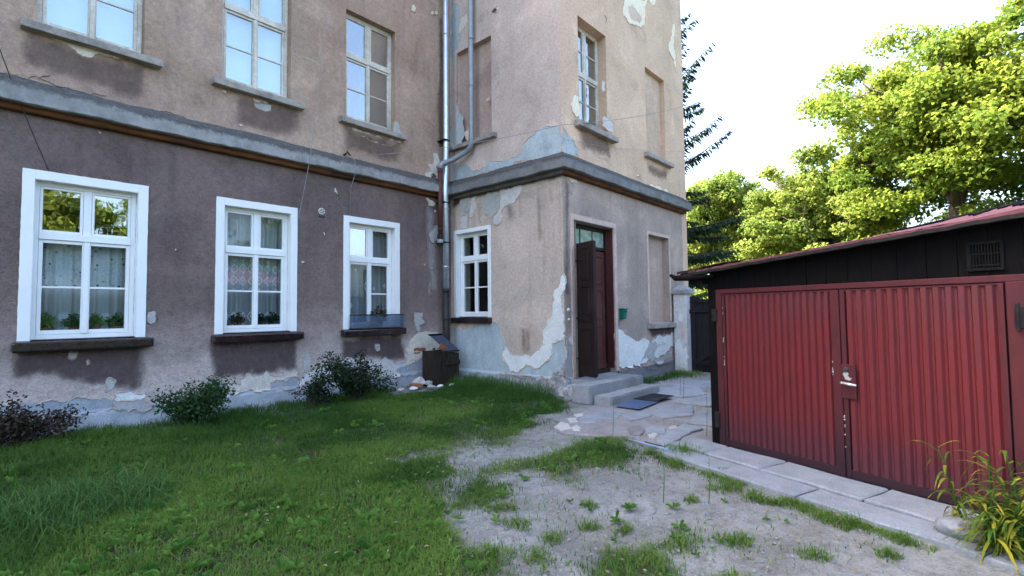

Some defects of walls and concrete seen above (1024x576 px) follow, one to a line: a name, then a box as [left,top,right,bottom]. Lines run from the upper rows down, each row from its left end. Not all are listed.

peeling [622,0,657,29]
peeling [570,94,581,118]
peeling [602,116,615,133]
peeling [459,185,523,229]
leakage [15,347,140,388]
leakage [212,339,296,376]
peeling [203,311,440,396]
peeling [452,272,573,397]
peeling [614,314,689,369]
peeling [74,377,155,418]